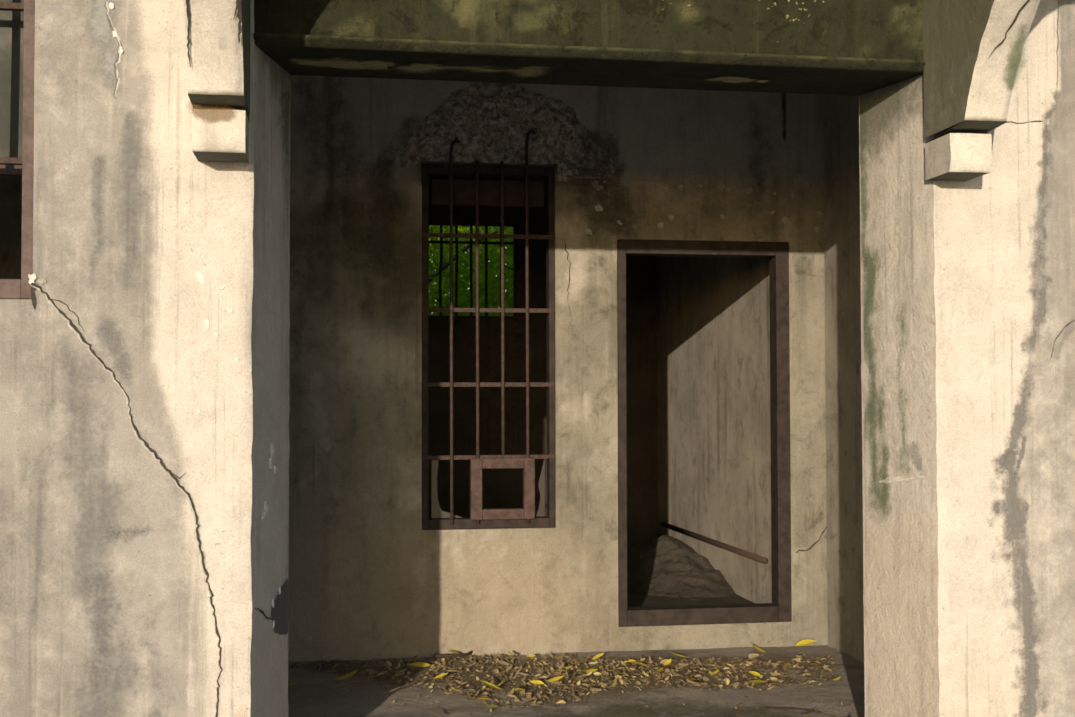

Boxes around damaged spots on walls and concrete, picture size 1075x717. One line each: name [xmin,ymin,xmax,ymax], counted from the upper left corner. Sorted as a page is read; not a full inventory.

crack [184,0,192,66]
crack [234,0,242,43]
crack [989,0,1030,88]
water stain [124,118,138,215]
spalling [293,59,615,182]
water stain [1040,92,1057,196]
water stain [1023,279,1049,350]
crack [28,273,223,717]
water stain [993,379,1046,717]
spalling [271,579,288,635]